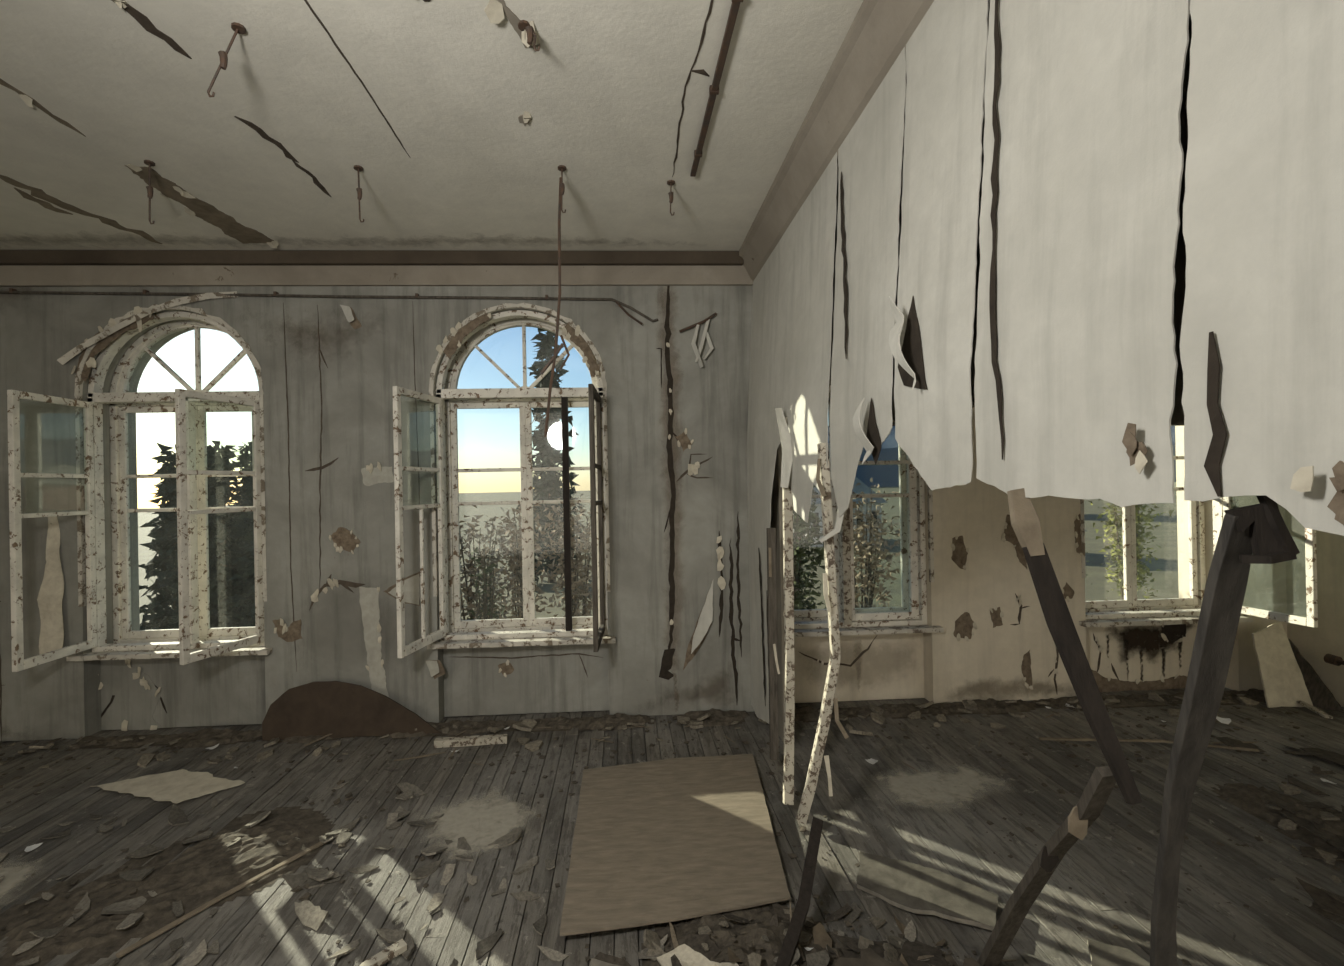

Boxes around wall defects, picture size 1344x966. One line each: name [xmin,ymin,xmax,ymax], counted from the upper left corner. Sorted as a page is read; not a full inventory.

crack [111,0,192,59]
crack [0,78,86,137]
crack [234,116,331,197]
crack [0,175,162,244]
peeling [1122,423,1148,474]
crack [657,286,712,680]
peeling [1290,460,1344,526]
flaking render [951,536,969,570]
flaking render [1001,515,1027,569]
crack [716,514,743,703]
damp [1107,624,1192,681]
crack [0,655,8,742]